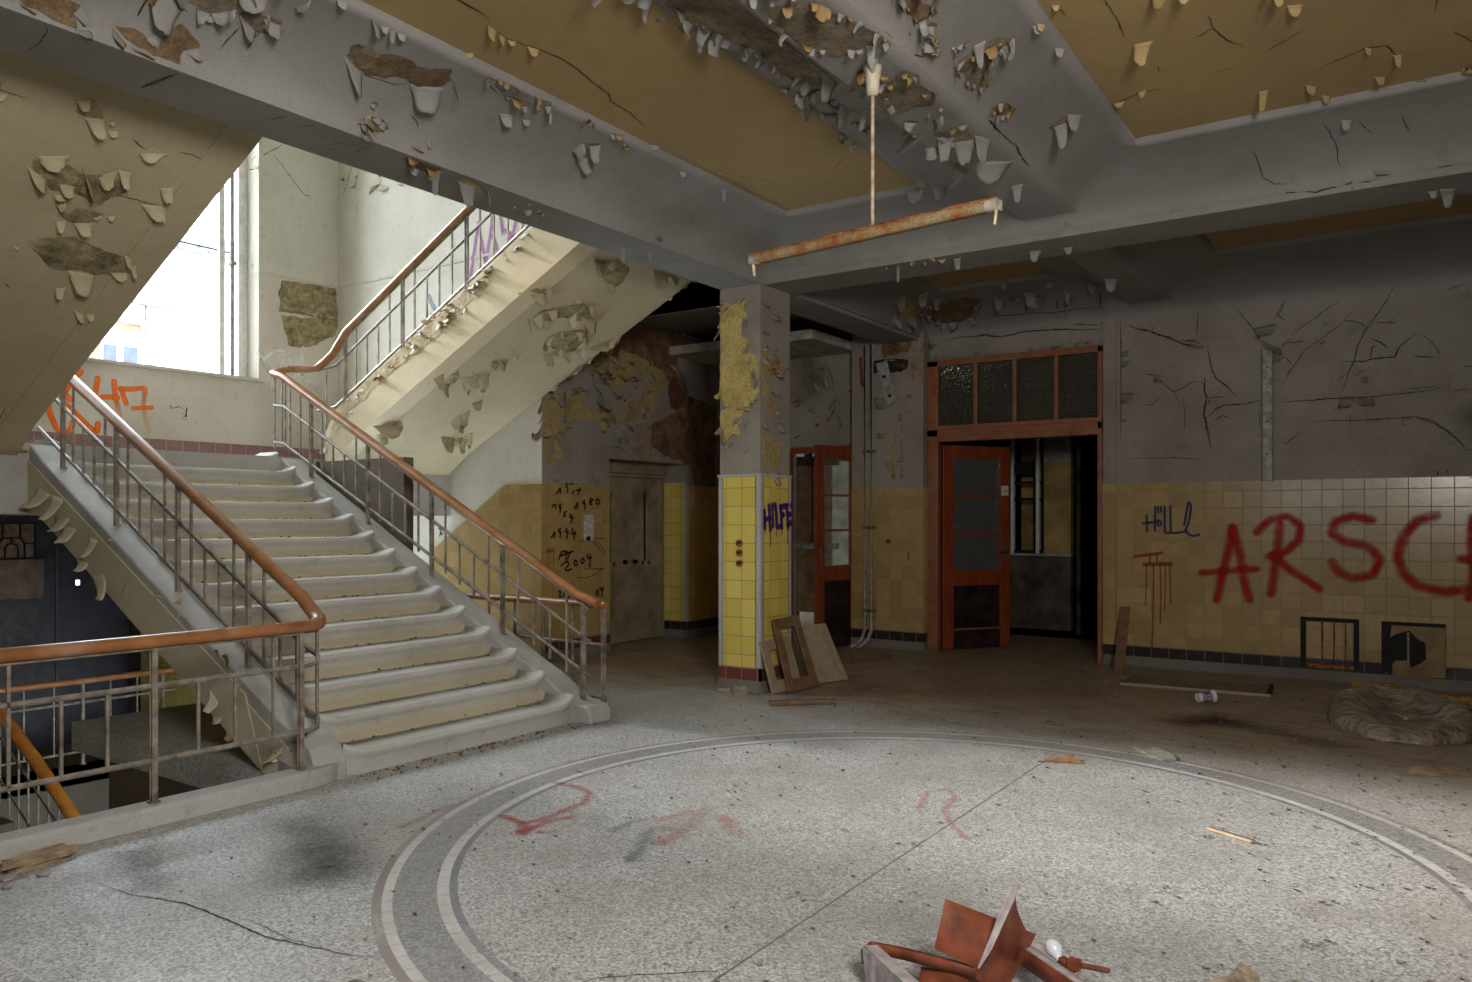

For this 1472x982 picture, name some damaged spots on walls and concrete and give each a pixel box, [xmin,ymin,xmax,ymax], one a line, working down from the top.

peeling [20,0,94,39]
peeling [0,99,201,323]
peeling [112,0,312,65]
peeling [488,25,540,57]
crack [458,0,646,128]
peeling [570,119,631,176]
peeling [622,0,1023,204]
crack [1189,17,1308,72]
crack [1328,45,1397,65]
spalling [319,204,544,454]
peeling [518,257,1119,487]
crack [952,288,1472,459]